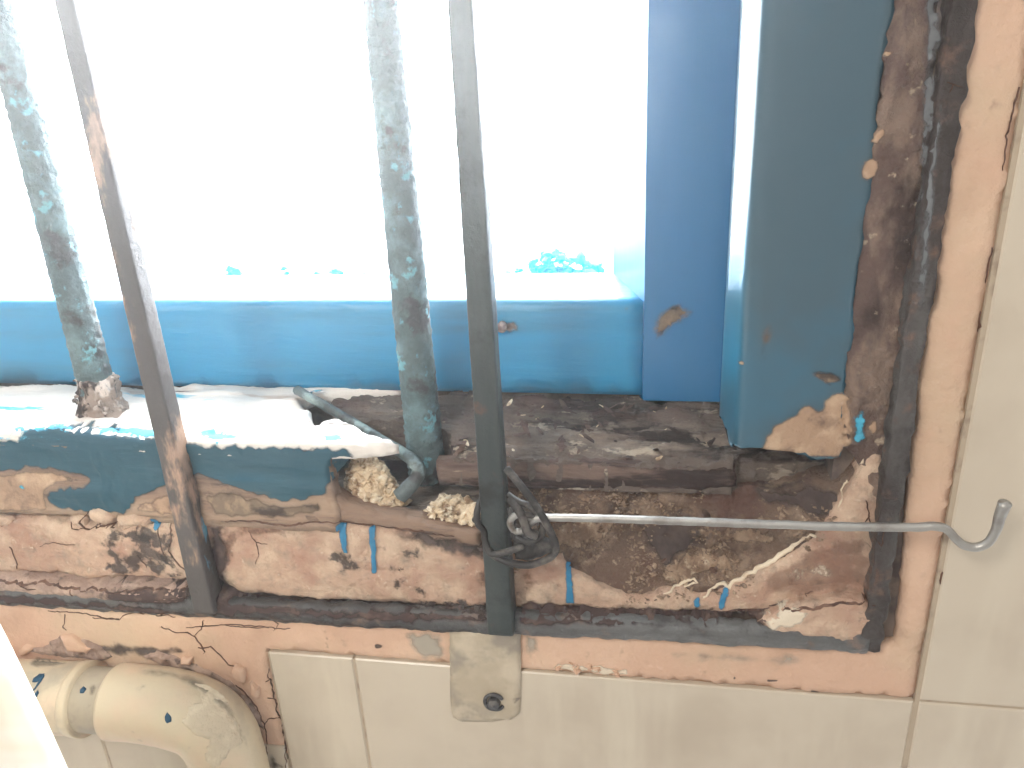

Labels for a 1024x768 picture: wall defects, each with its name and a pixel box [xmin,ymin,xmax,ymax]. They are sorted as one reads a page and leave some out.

peeling [657,306,686,334]
peeling [0,472,72,511]
peeling [207,493,319,518]
spalling [503,372,877,604]
crack [40,512,118,547]
mould [101,527,178,580]
crack [715,591,876,612]
crack [0,523,290,768]